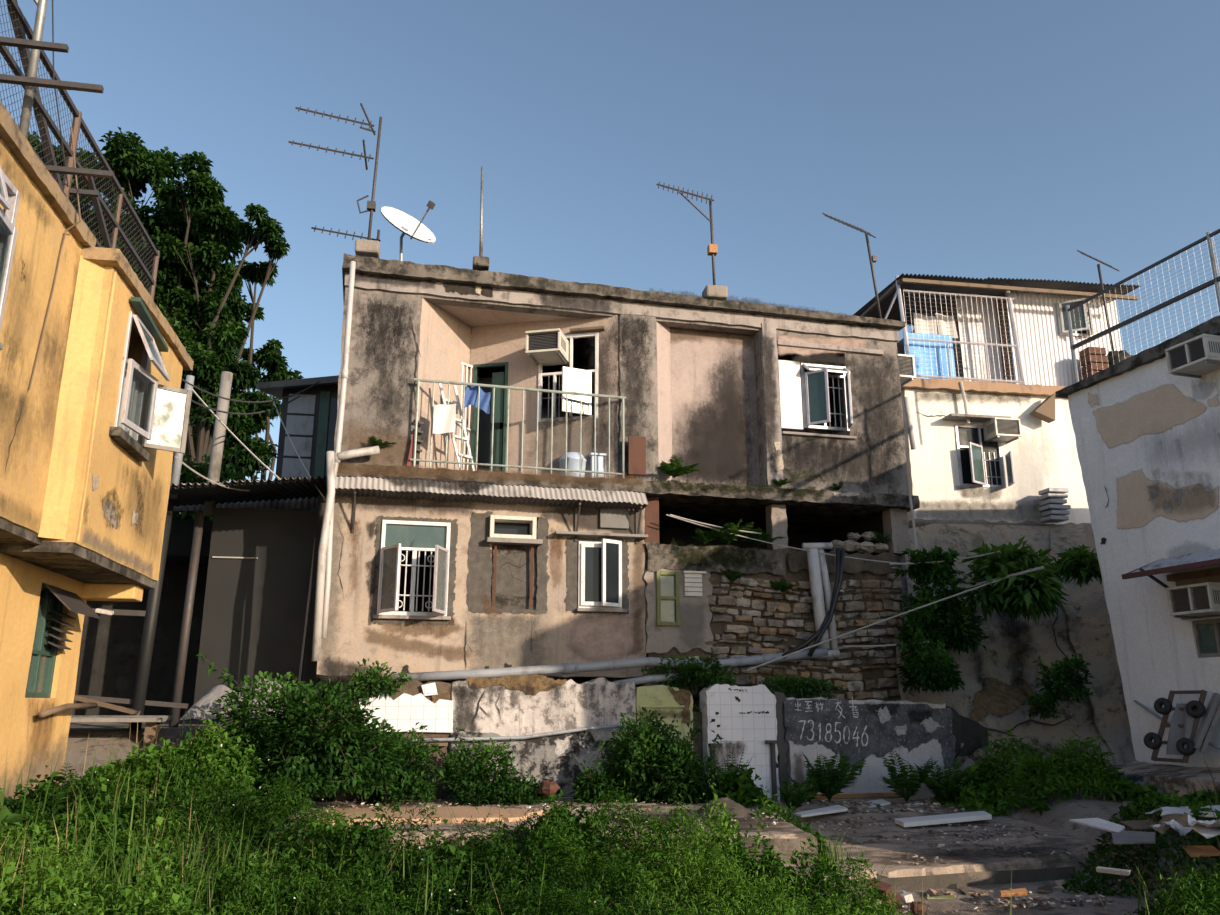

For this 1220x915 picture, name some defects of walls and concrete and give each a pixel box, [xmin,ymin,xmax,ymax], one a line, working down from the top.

water stain [357,305,413,431]
water stain [673,360,750,482]
water stain [761,336,905,490]
peeling [1088,384,1219,448]
peeling [103,498,138,528]
peeling [1116,469,1219,529]
spalling [466,663,566,695]
peeling [554,729,619,773]
peeling [875,706,942,736]
crack [964,716,1075,755]